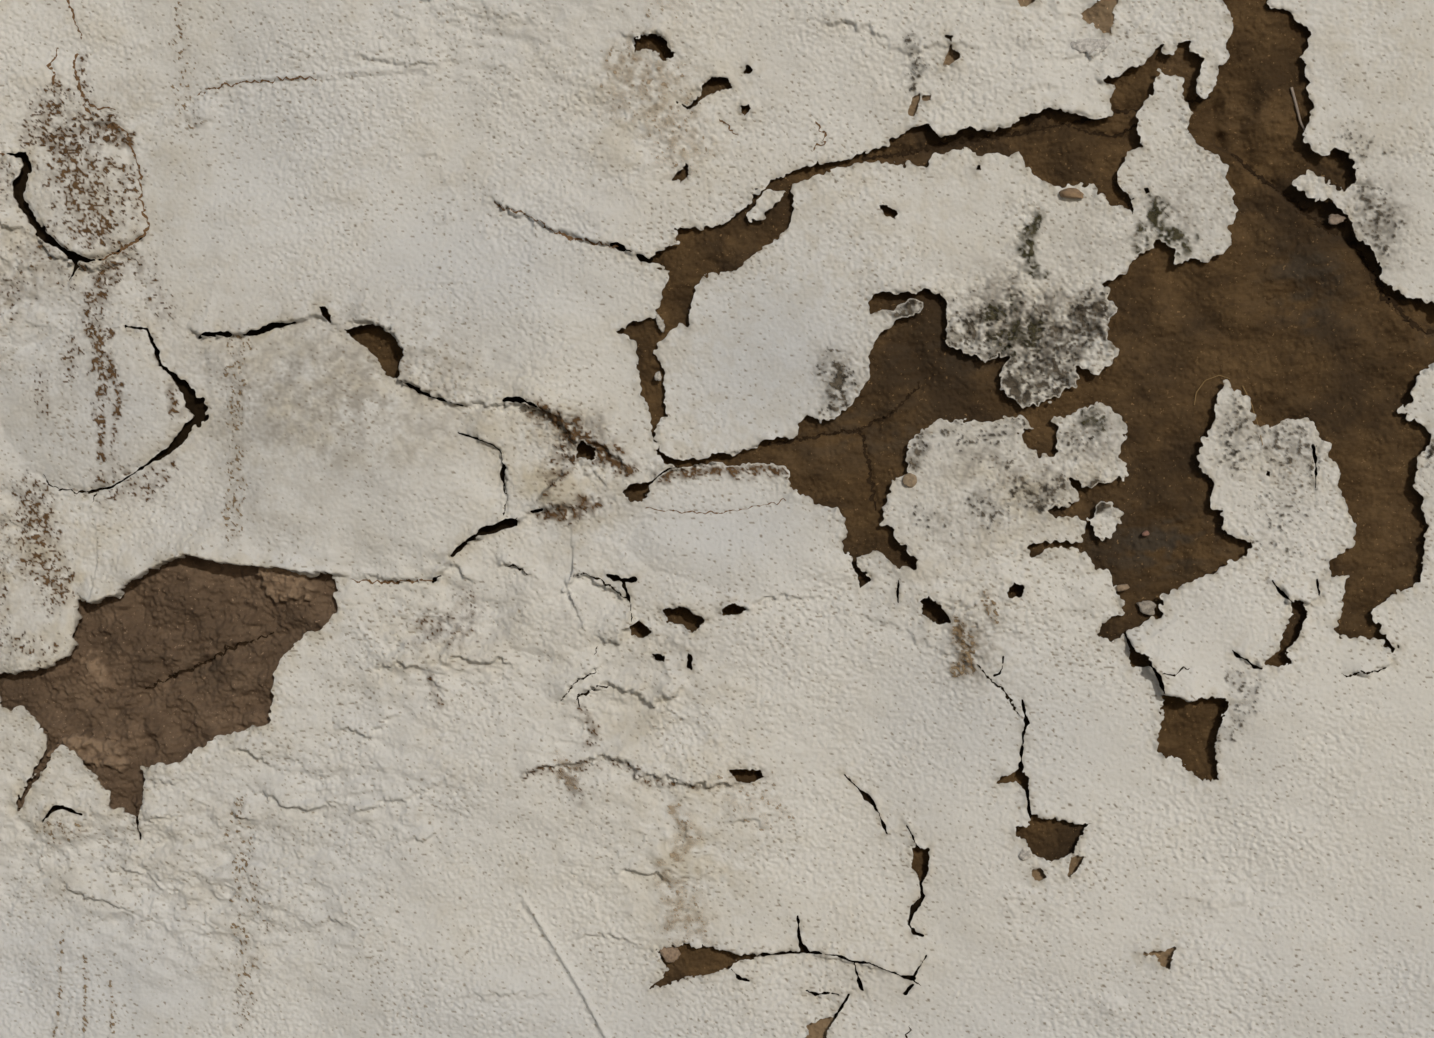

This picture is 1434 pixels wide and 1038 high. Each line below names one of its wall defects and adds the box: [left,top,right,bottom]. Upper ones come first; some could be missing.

crack [0,0,150,279]
crack [43,325,209,503]
peeling [319,306,404,383]
peeling [616,0,1434,783]
peeling [0,555,338,844]
crack [977,656,1032,818]
peeling [649,943,763,989]
peeling [805,1014,835,1038]
crack [731,774,927,1038]
peeling [911,846,930,882]